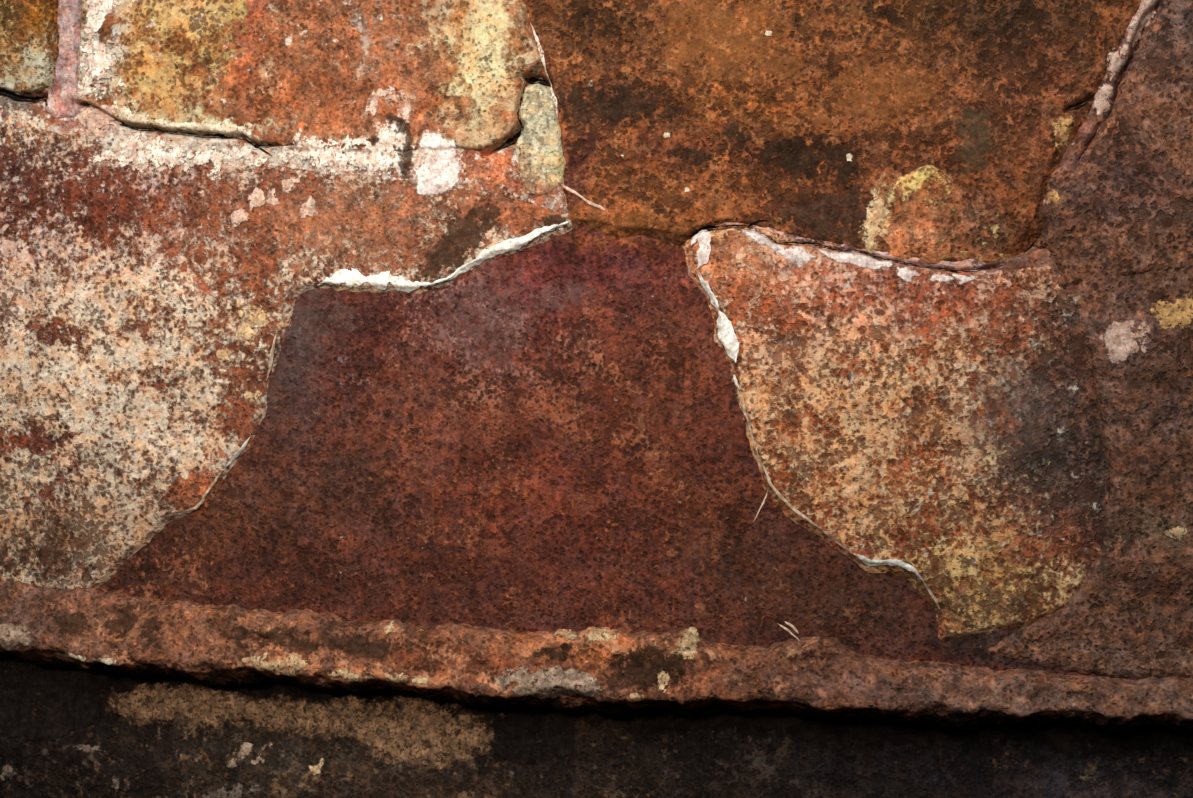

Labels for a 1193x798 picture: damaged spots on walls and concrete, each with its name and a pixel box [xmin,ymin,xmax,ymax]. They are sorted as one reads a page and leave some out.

crack [0,89,48,105]
crack [76,103,302,155]
crack [1065,100,1088,112]
spalling [100,221,1100,677]